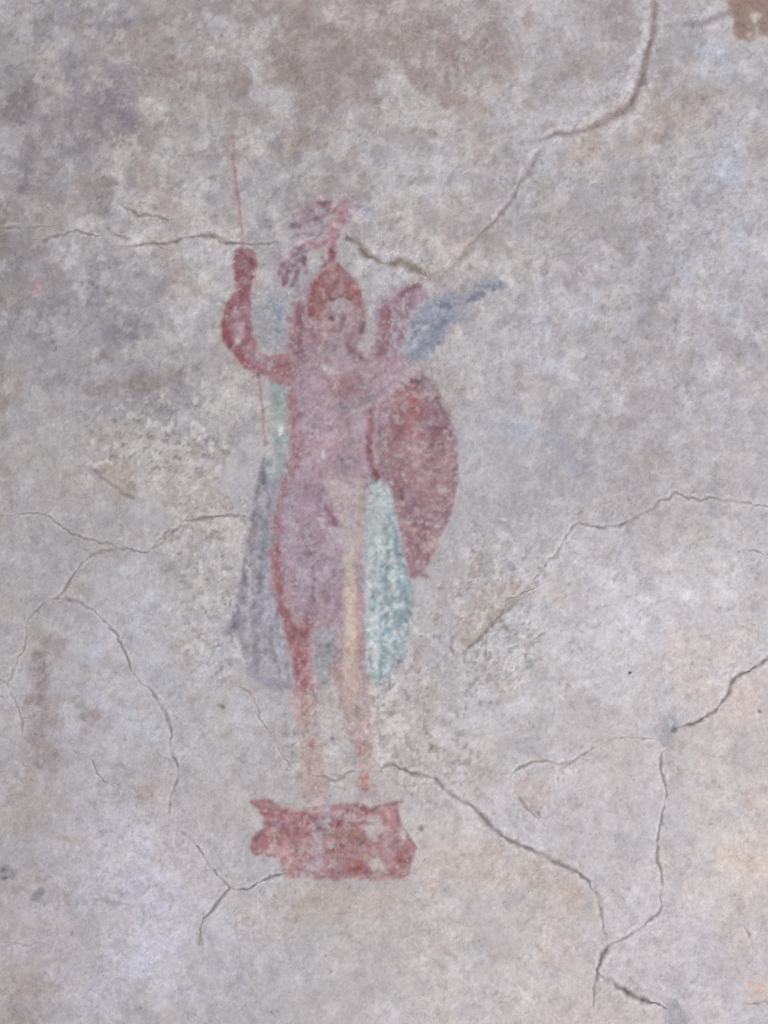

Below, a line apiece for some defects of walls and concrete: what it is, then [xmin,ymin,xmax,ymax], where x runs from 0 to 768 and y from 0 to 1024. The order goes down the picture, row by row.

crack [0,208,272,251]
crack [346,0,657,277]
crack [505,492,768,601]
crack [1,512,289,944]
crack [381,658,768,1009]